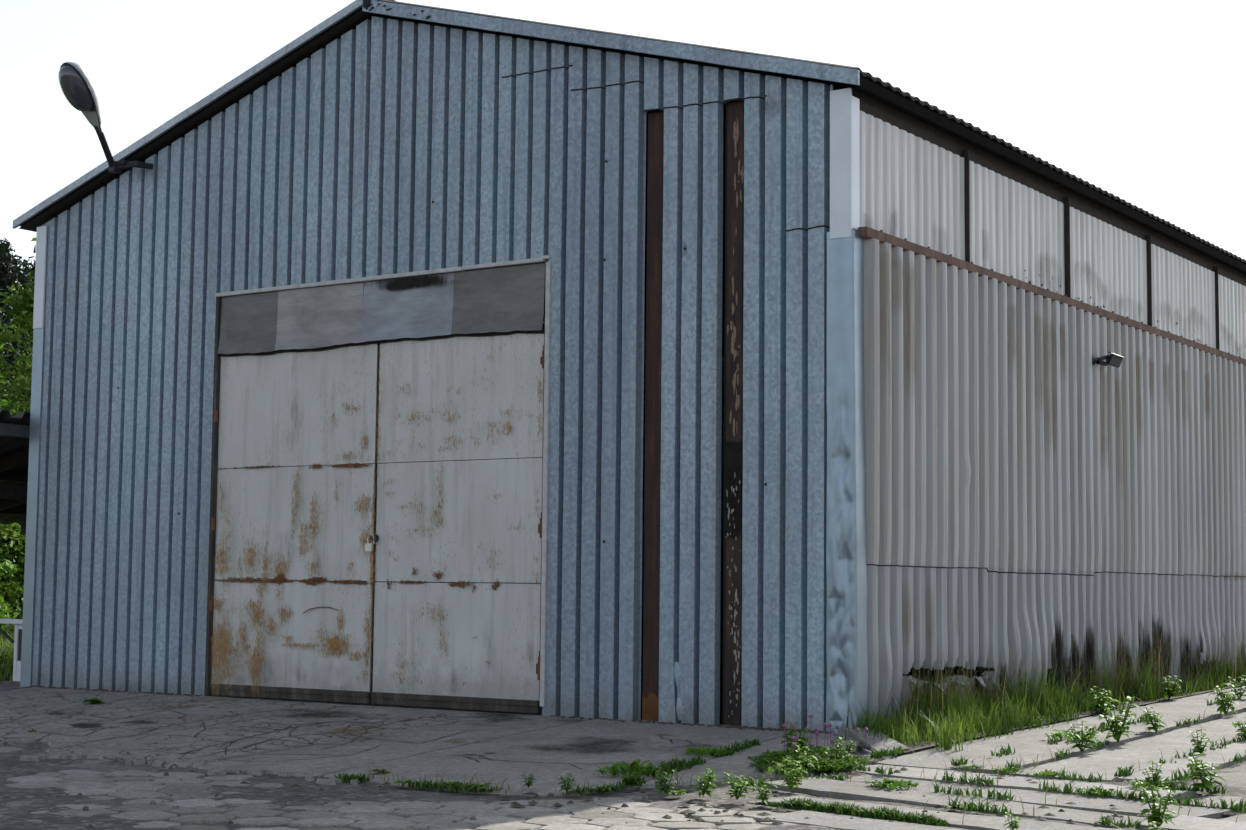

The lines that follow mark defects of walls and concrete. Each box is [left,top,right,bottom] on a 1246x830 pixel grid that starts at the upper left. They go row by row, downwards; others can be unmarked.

crack [6,708,602,769]
corrosion [210,378,476,690]
corrosion [642,691,658,721]
peeling [725,475,742,706]